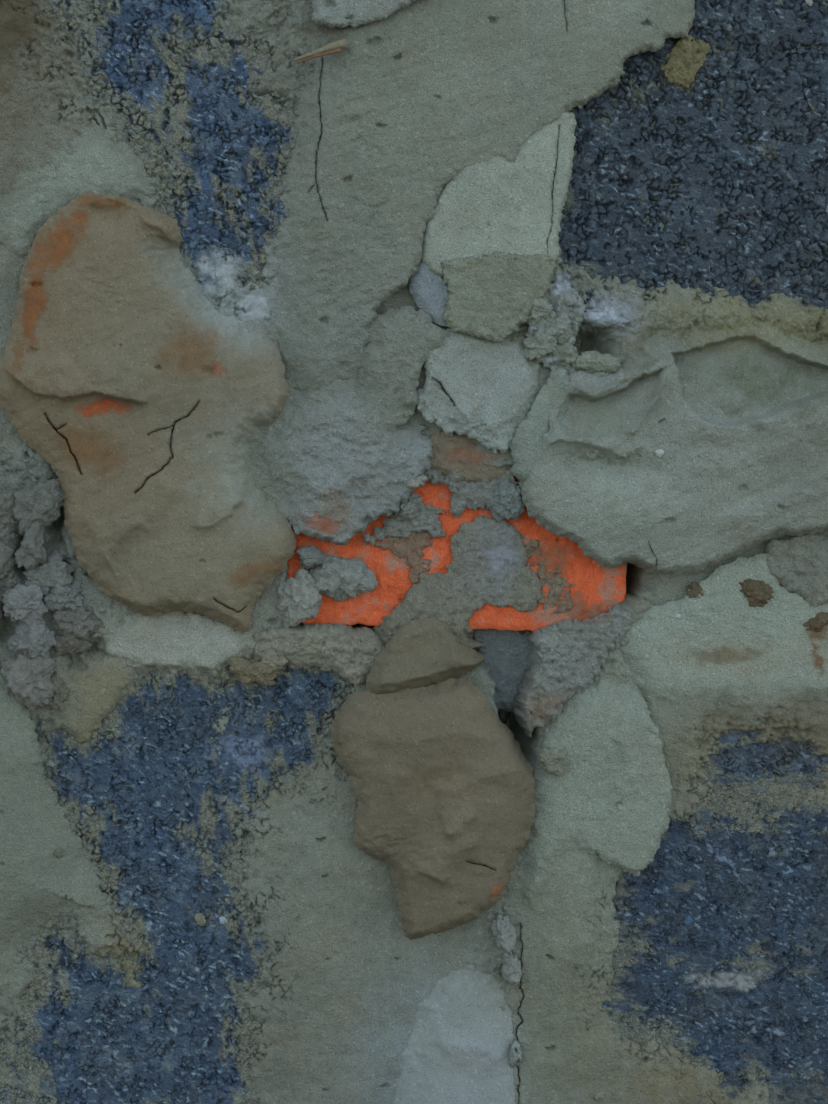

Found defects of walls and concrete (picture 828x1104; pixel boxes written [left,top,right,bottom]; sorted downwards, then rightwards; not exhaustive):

spalling [17,0,300,310]
spalling [558,0,828,311]
crack [45,414,82,475]
crack [136,402,199,492]
spalling [0,666,354,1104]
crack [514,924,524,1104]
spalling [602,728,828,1104]